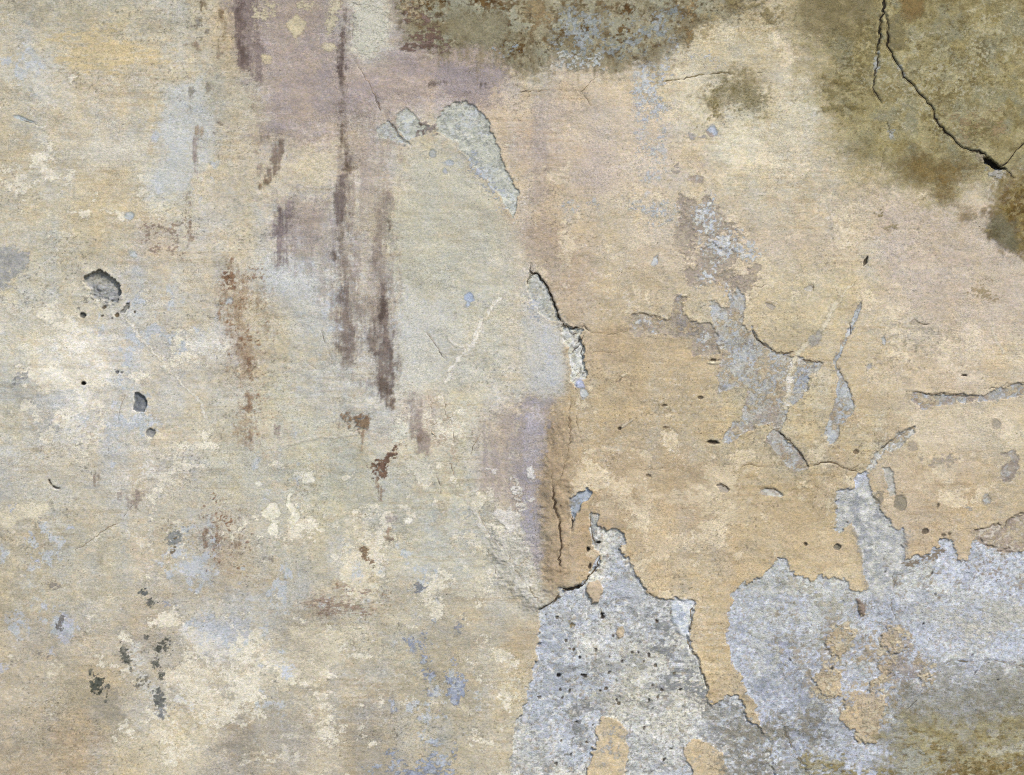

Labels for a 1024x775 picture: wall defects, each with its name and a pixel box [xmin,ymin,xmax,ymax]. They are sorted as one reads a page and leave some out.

crack [873,0,1024,179]
peeling [376,101,520,218]
spalling [78,269,136,319]
rust [222,258,243,309]
crack [527,267,626,353]
peeling [629,193,862,471]
rust [340,412,371,437]
rust [371,445,398,492]
crack [427,296,600,609]
peeling [493,466,535,537]
spalling [509,426,1024,775]